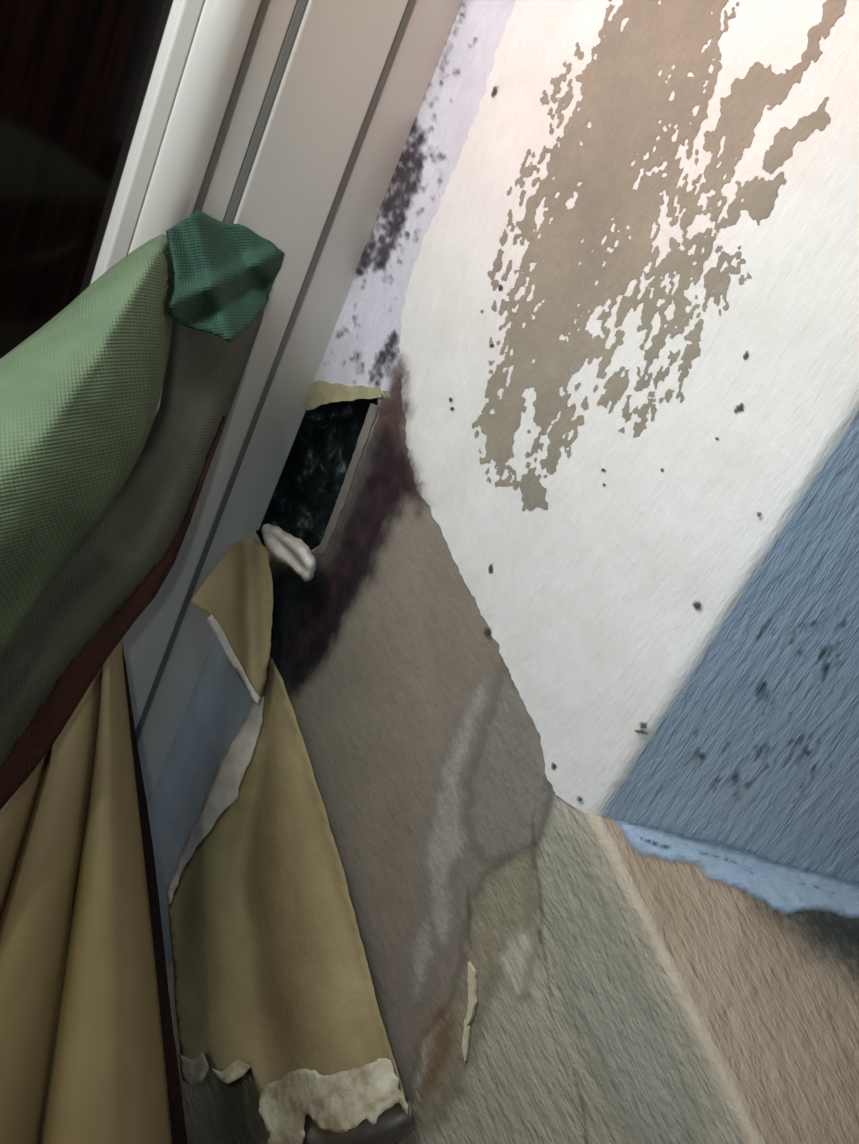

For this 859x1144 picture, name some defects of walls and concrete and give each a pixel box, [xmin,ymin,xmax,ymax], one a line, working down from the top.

leakage [356,119,445,275]
peeling [472,0,846,511]
spalling [256,398,379,553]
leakage [269,331,421,695]
peeling [286,415,556,1128]
leakage [765,902,859,976]